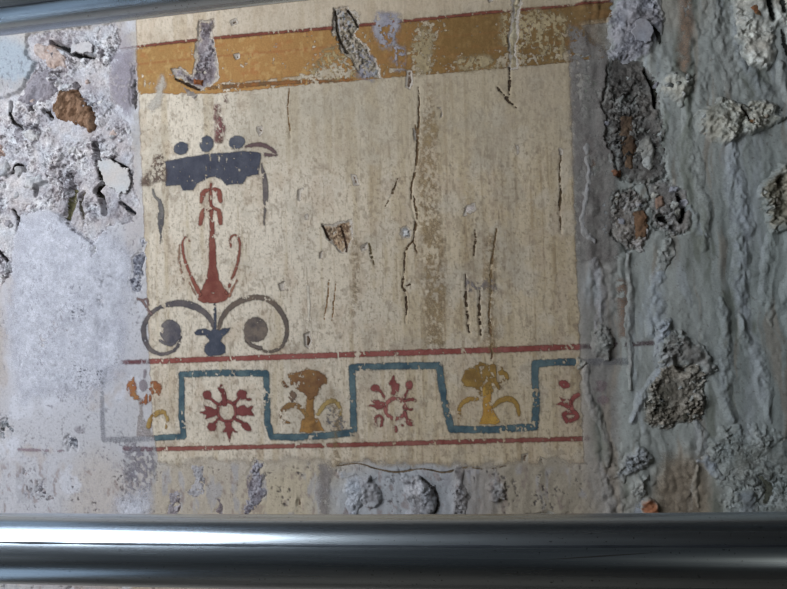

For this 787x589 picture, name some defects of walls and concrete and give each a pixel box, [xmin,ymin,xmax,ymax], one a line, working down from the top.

spalling [173,20,219,100]
spalling [312,7,380,79]
crack [497,67,517,108]
spalling [0,22,141,286]
spalling [322,221,352,253]
crack [385,87,420,315]
crack [463,228,497,359]
spalling [601,58,693,254]
damp [569,0,787,513]
spalling [643,364,707,430]